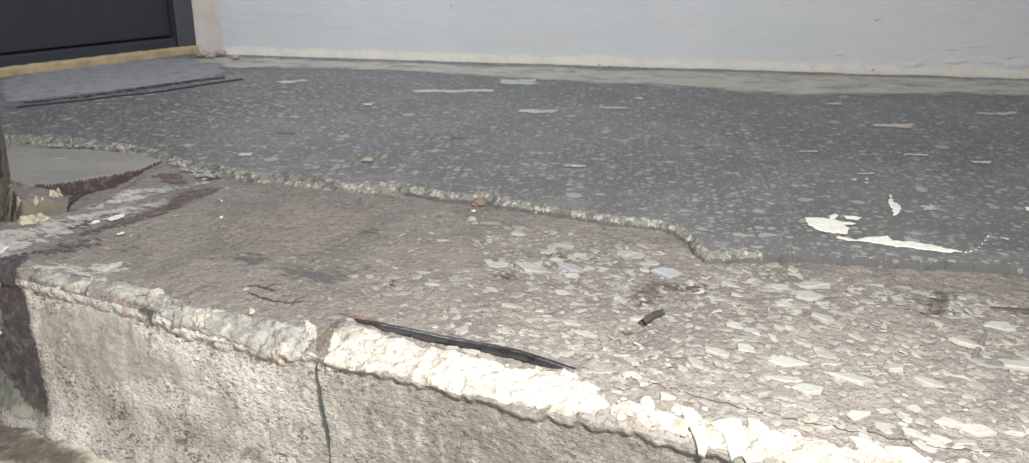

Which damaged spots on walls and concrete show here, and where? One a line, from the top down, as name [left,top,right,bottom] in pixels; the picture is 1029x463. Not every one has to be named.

crack [315,362,331,463]
spalling [2,129,1029,463]